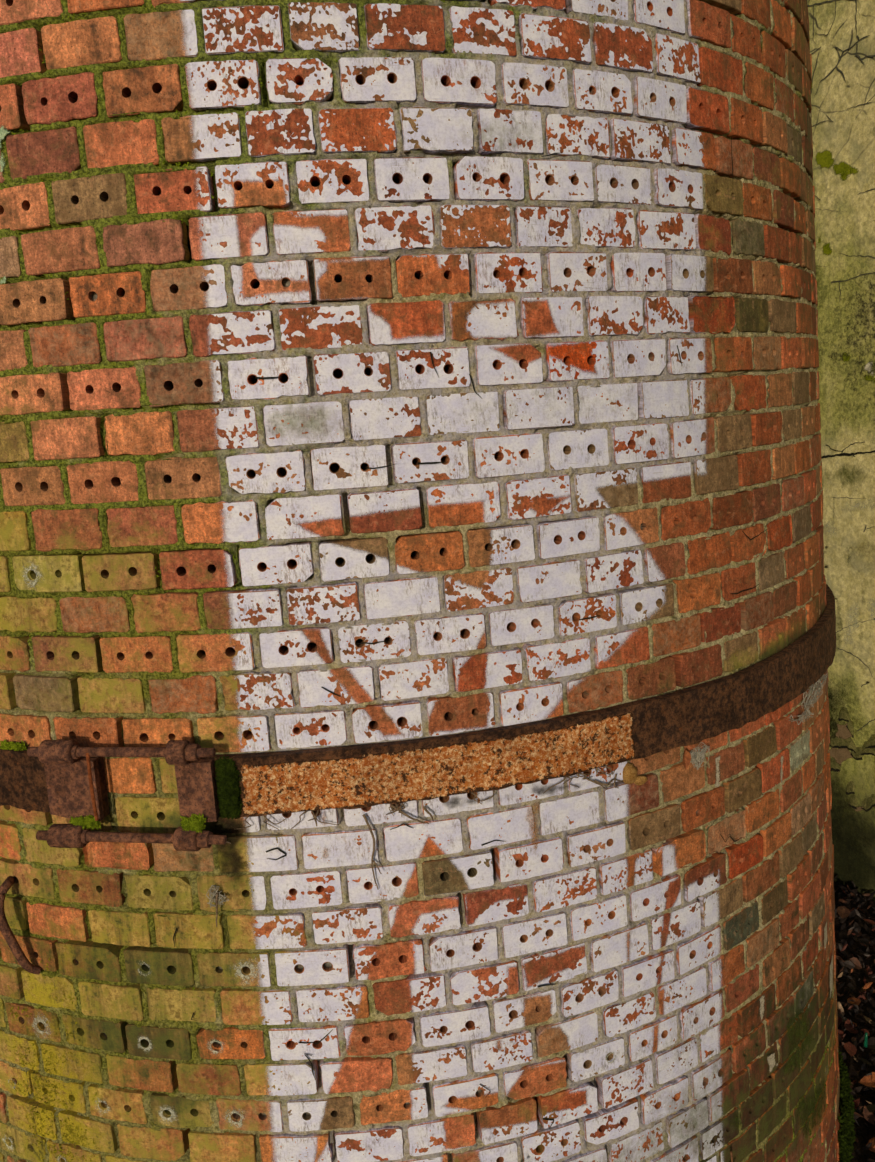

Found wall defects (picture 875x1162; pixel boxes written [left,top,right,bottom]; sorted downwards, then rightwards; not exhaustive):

crack [808,0,875,126]
peeling [191,0,700,293]
crack [819,253,875,295]
peeling [208,307,541,395]
spalling [591,296,736,378]
spalling [216,409,306,494]
crack [821,442,875,459]
peeling [237,585,405,659]
leakage [828,687,845,736]
corrosion [240,713,635,815]
leakage [831,770,875,889]
spalling [255,875,655,1070]